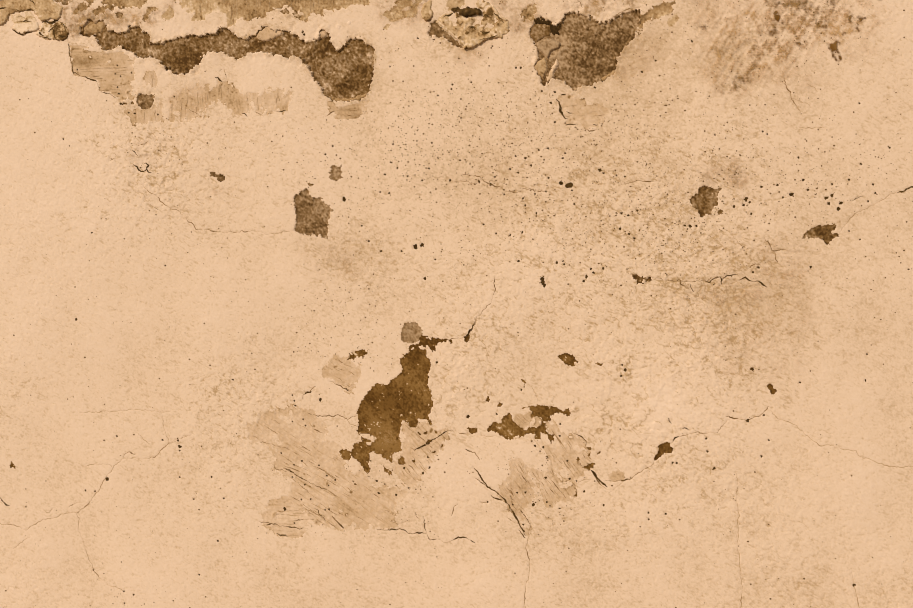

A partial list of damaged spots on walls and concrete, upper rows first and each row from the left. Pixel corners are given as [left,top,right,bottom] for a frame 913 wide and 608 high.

peeling [381,0,422,30]
peeling [417,0,510,59]
flaking render [0,0,375,126]
flaking render [520,0,679,130]
flaking render [294,183,334,239]
flaking render [683,185,752,228]
flaking render [802,224,850,245]
peeling [246,322,452,538]
peeling [466,396,625,538]
crack [668,408,911,468]
crack [0,409,193,591]